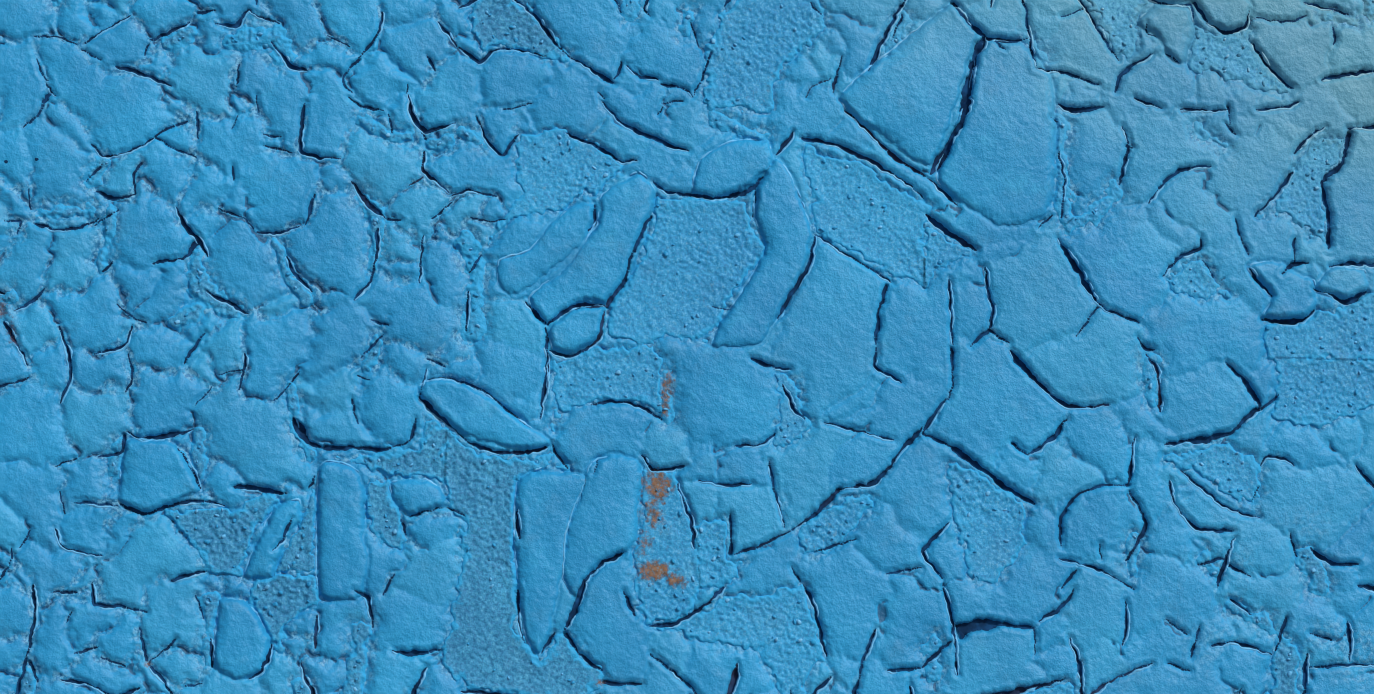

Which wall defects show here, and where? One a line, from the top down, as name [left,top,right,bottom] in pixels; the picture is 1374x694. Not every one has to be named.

crack [0,0,308,128]
peeling [107,0,826,694]
crack [218,0,1349,555]
peeling [802,144,972,289]
crack [1235,125,1374,327]
crack [0,353,320,694]
crack [516,552,740,694]
corrosion [638,472,686,586]
peeling [946,462,1027,584]
peeling [1026,682,1074,694]
crack [790,438,1374,694]
crack [1164,362,1296,615]